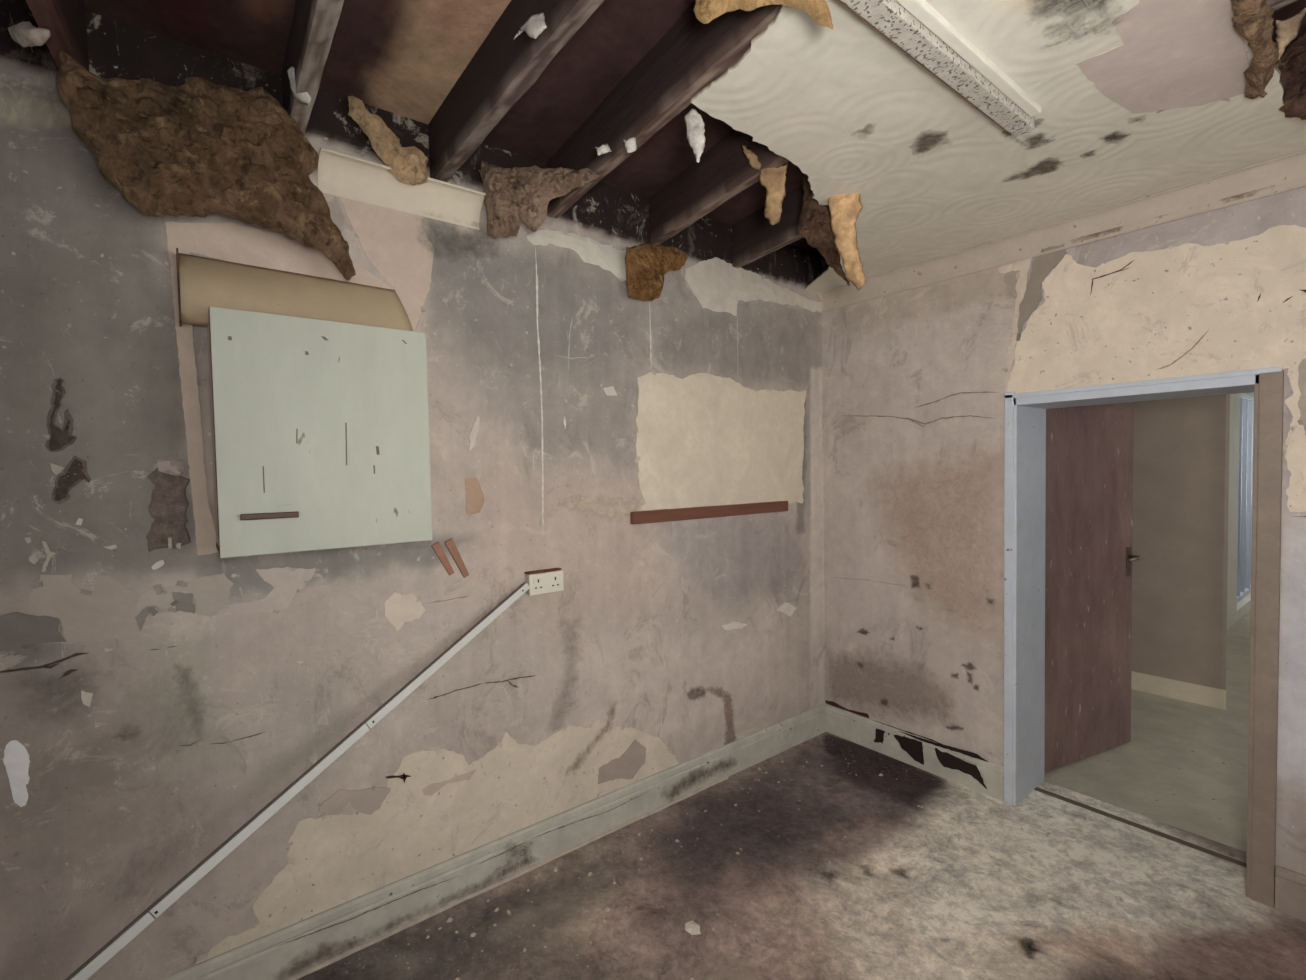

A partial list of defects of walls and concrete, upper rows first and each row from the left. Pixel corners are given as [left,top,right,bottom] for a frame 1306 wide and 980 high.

water stain [1040,0,1107,15]
spalling [526,228,627,281]
spalling [685,257,822,316]
spalling [45,378,91,504]
spalling [602,386,617,396]
flaking render [635,370,807,511]
peeling [1002,225,1306,512]
peeling [28,458,316,644]
peeling [874,729,988,789]
peeling [191,719,679,966]